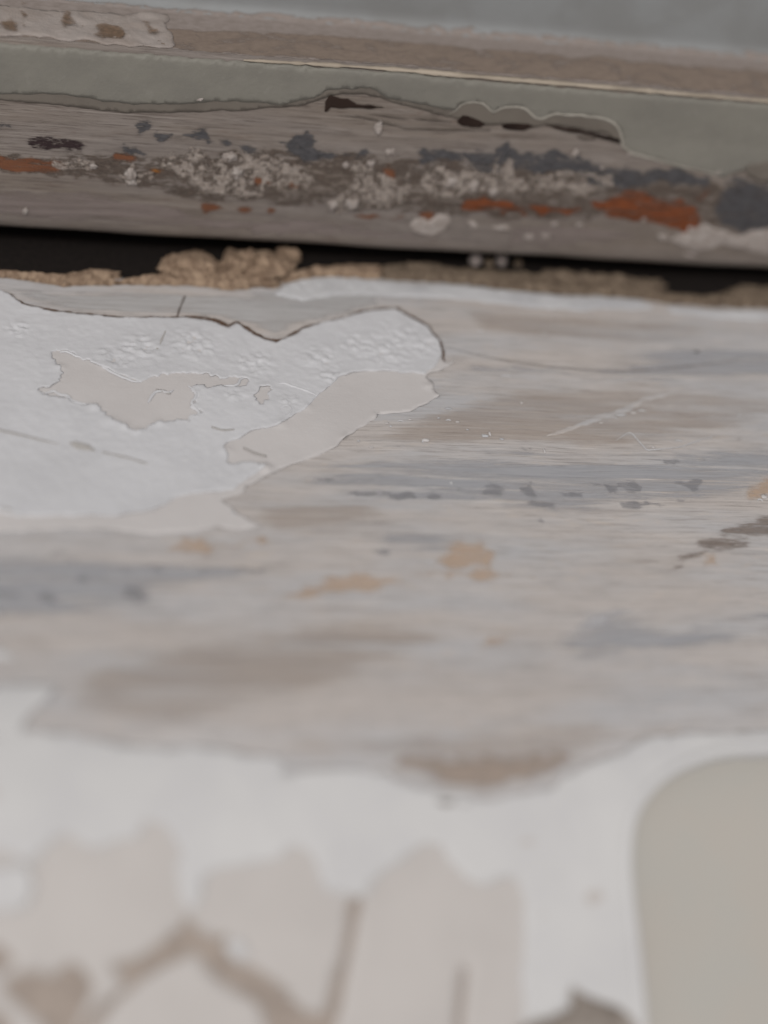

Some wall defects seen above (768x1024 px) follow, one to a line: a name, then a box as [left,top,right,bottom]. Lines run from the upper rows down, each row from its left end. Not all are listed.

peeling [0,5,768,182]
rust [0,156,64,173]
rust [460,196,580,216]
rust [592,191,701,233]
peeling [0,246,768,534]